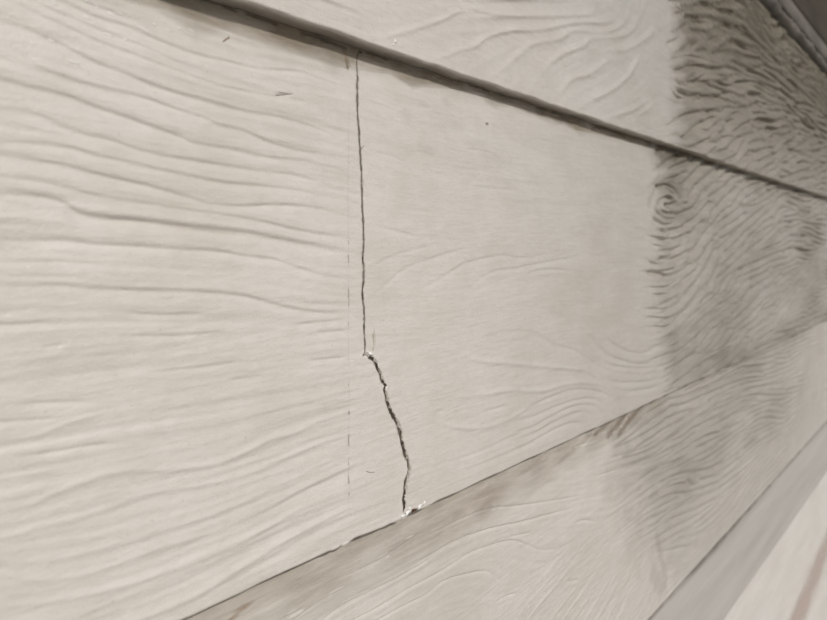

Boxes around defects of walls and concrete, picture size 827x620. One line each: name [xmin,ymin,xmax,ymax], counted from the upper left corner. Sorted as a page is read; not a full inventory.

crack [356,50,410,512]